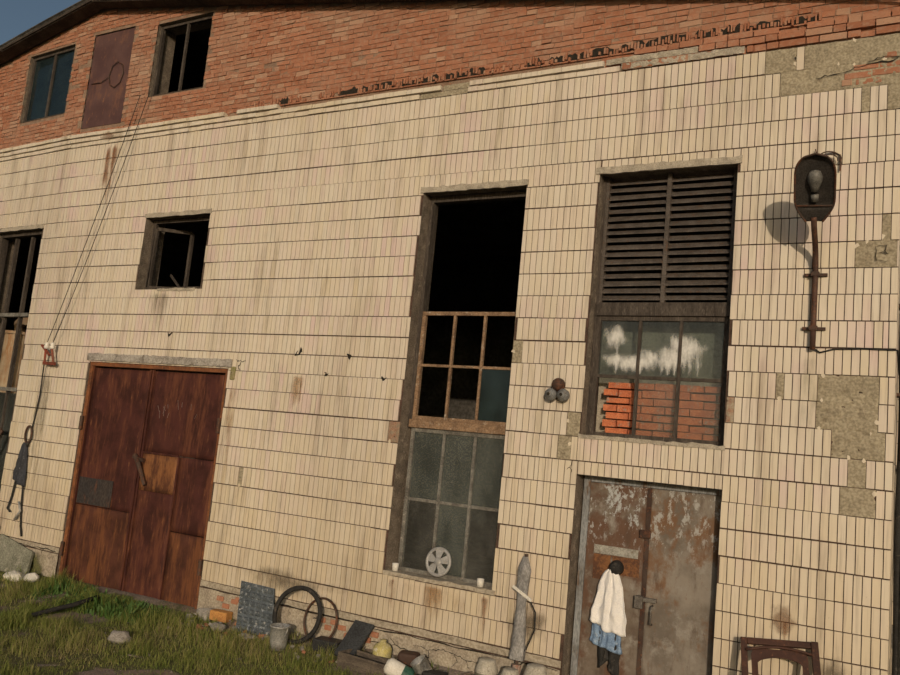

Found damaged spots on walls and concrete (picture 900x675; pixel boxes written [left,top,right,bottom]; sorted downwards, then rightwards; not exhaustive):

spalling [765,33,900,112]
peeling [855,214,899,267]
peeling [815,373,885,518]